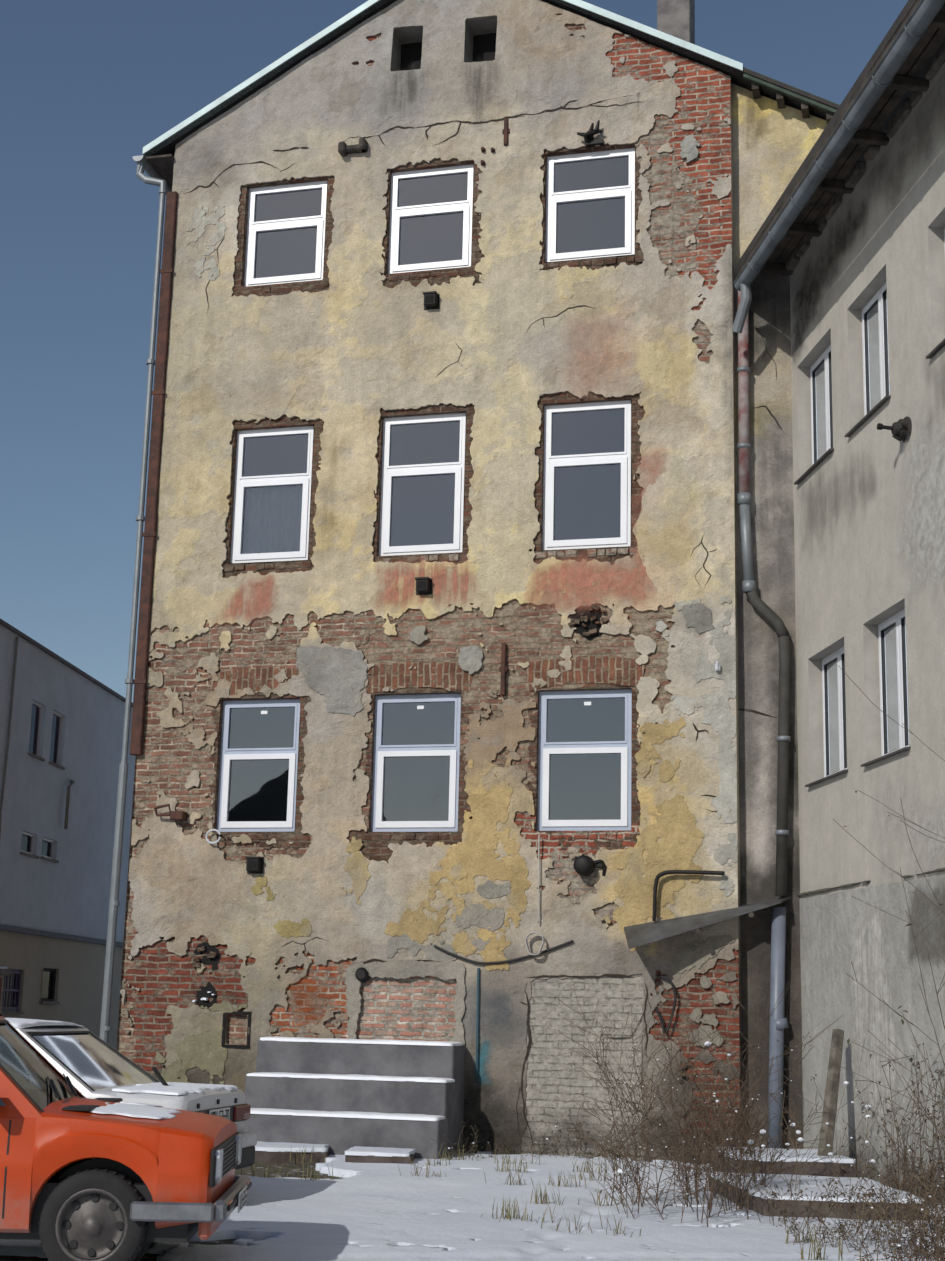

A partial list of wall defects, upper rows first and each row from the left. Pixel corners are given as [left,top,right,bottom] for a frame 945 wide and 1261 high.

crack [183,94,646,194]
flaking render [606,34,732,364]
crack [691,532,717,586]
flaking render [131,596,738,971]
flaking render [118,881,256,1085]
flaking render [270,918,358,1039]
flaking render [649,935,740,1162]